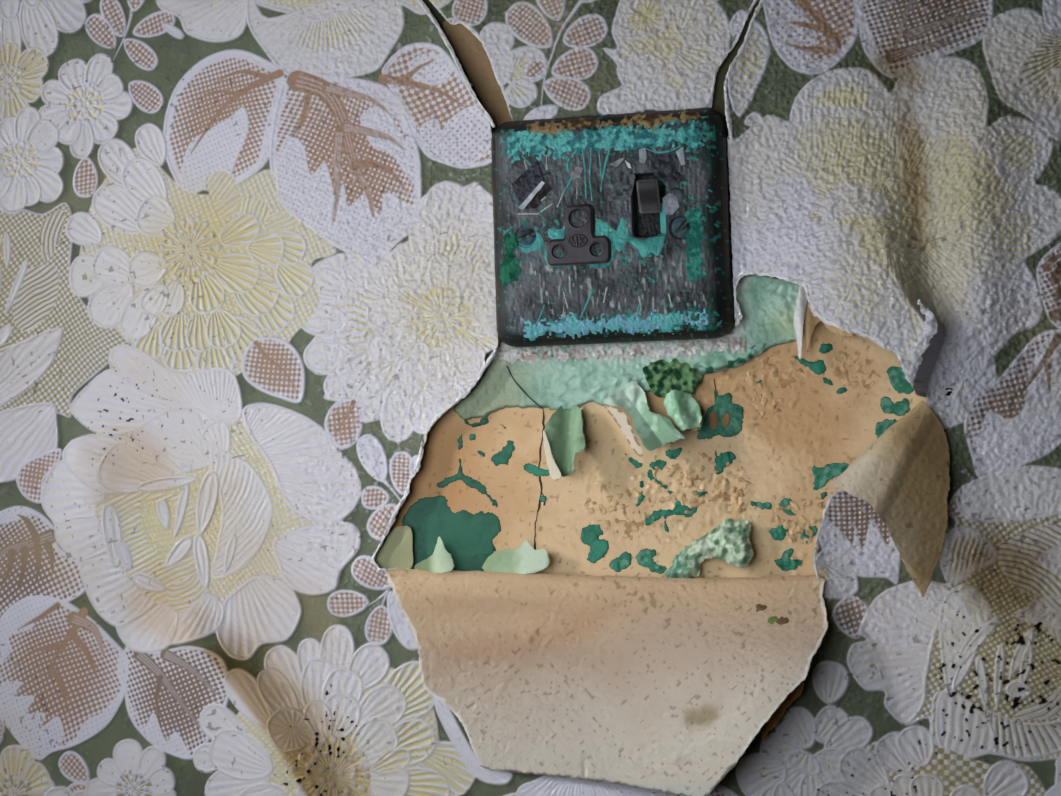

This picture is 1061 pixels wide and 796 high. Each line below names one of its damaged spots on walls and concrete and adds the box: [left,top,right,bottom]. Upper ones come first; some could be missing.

peeling [374,526,454,573]
peeling [453,274,881,572]